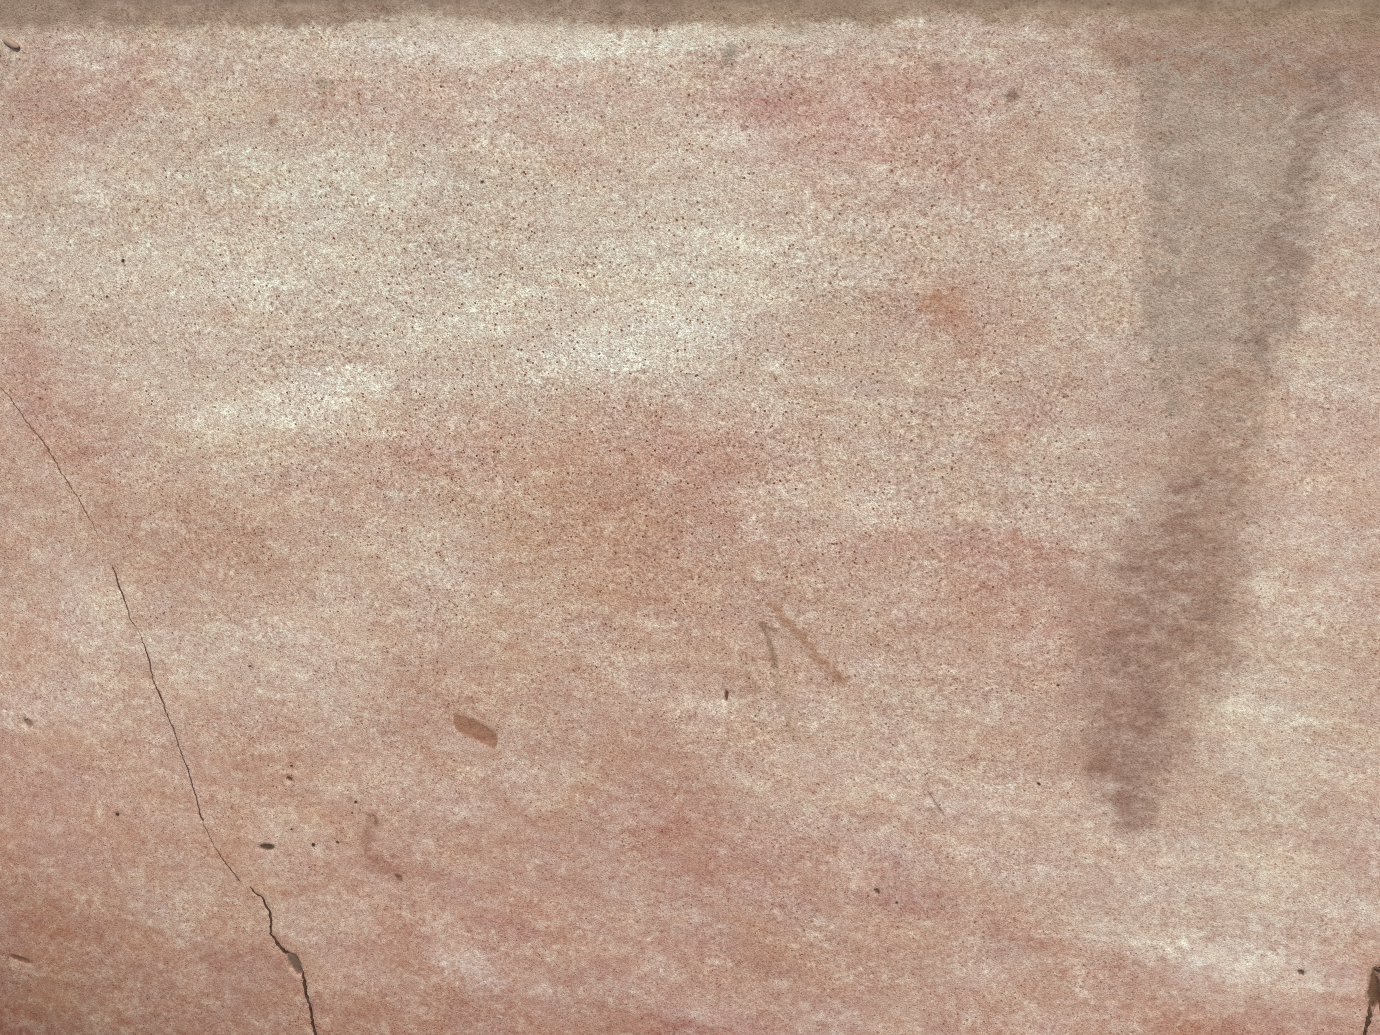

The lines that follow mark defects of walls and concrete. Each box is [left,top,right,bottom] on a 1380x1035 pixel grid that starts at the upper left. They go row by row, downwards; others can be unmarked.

crack [0,387,317,1035]
damp [1048,8,1380,845]
crack [1364,966,1380,1035]